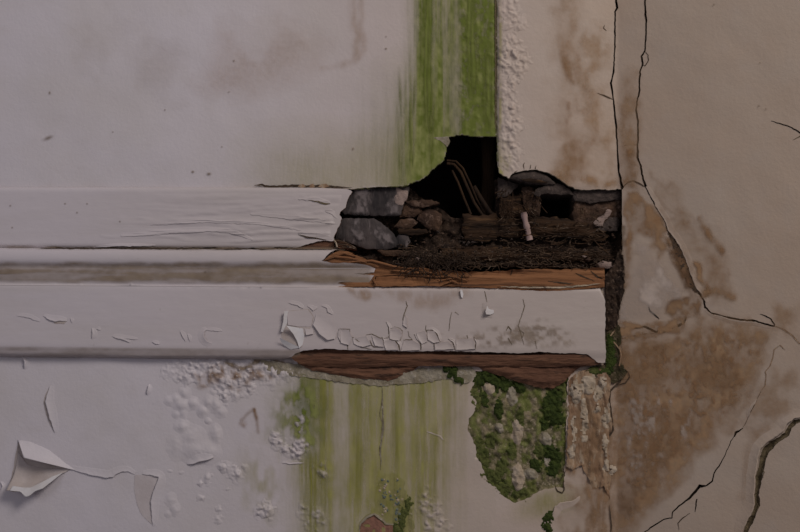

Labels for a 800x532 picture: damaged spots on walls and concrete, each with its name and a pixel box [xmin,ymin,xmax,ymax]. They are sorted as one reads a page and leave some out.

crack [56,234,324,250]
crack [254,184,352,205]
spalling [335,186,410,251]
spalling [568,200,622,229]
crack [598,0,800,532]
water stain [612,98,768,530]
flaking render [261,249,628,532]
peeling [0,440,74,497]
peeling [134,469,166,526]
water stain [268,410,328,484]